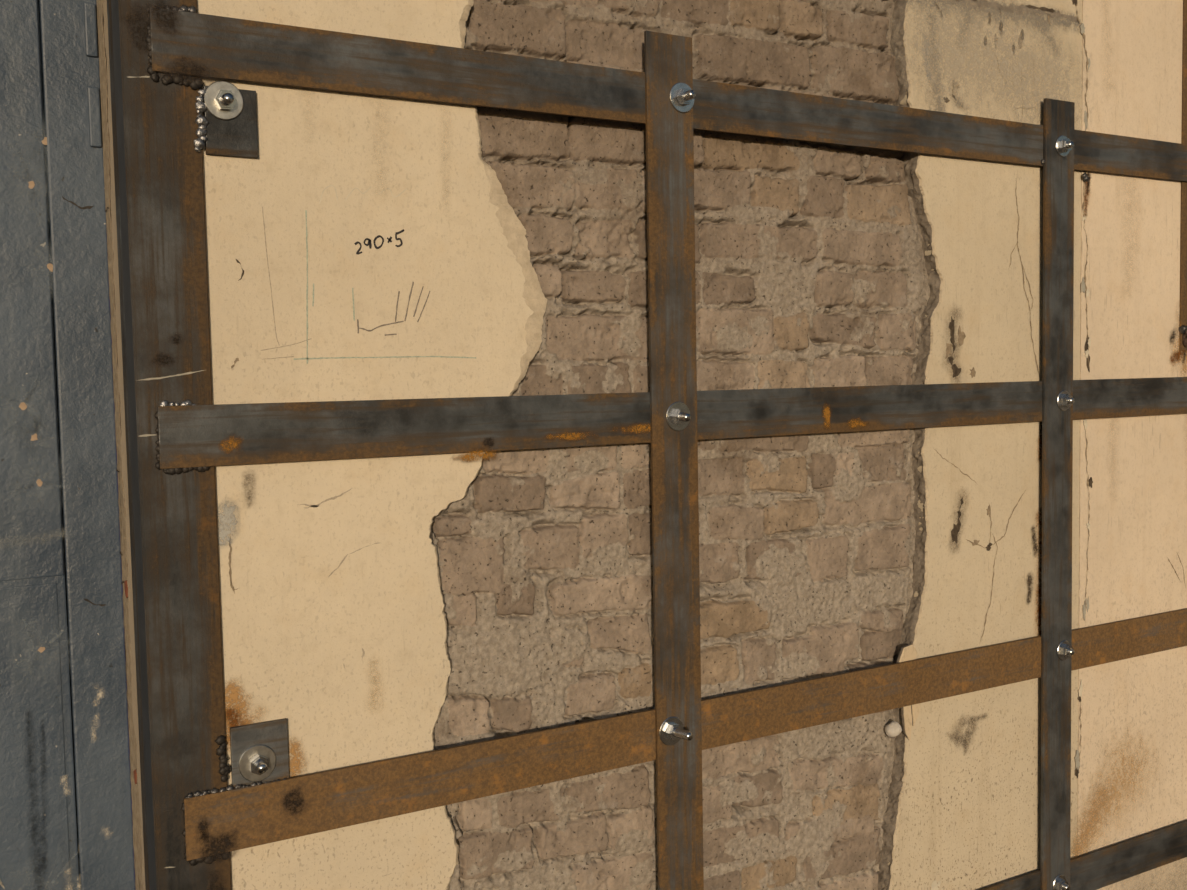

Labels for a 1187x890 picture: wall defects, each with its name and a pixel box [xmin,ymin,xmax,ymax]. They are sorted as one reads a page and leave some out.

flaking render [459,0,912,108]
flaking render [475,106,650,396]
flaking render [693,129,976,391]
crack [1009,170,1041,380]
corrosion [1170,331,1187,373]
flaking render [429,443,655,751]
flaking render [698,428,929,700]
crack [966,490,1026,645]
corrosion [224,683,256,749]
corrosion [288,742,304,778]
flaking render [444,760,658,890]
flaking render [702,703,921,890]